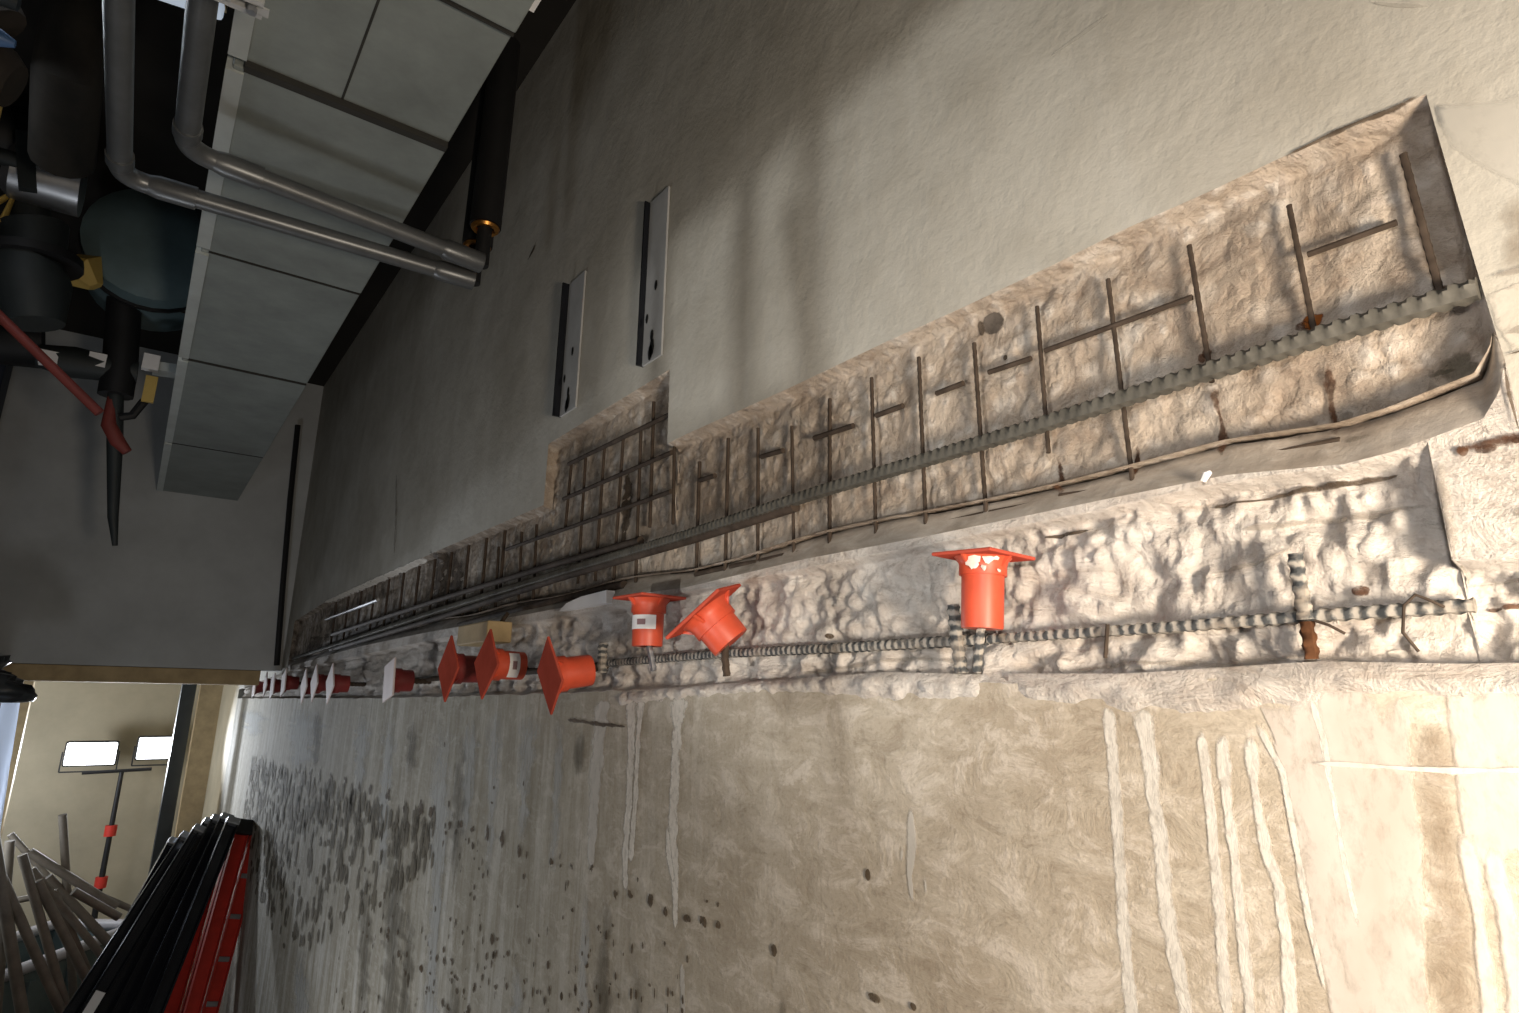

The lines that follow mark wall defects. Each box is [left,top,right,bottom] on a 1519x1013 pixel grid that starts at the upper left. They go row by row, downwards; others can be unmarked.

spalling [241,94,1519,713]
corrosion [1457,433,1519,456]
water stain [379,737,498,1013]
water stain [666,699,688,928]
water stain [1102,708,1139,1013]
water stain [1134,710,1193,1013]
water stain [1197,692,1428,1013]
water stain [1448,693,1519,1013]